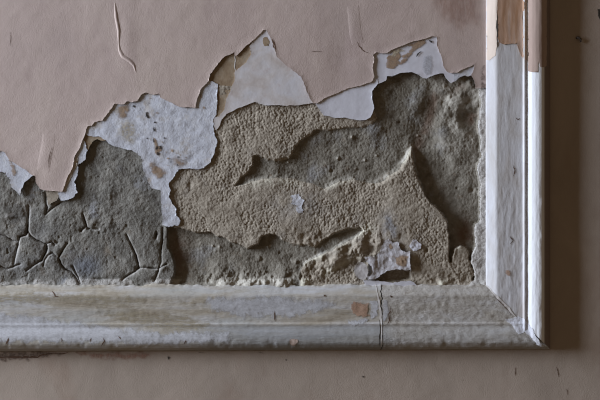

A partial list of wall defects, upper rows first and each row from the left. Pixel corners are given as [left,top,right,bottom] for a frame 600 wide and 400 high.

peeling [486,0,547,72]
spalling [0,30,486,292]
crack [2,216,81,284]
crack [124,233,166,279]
crack [375,284,391,347]